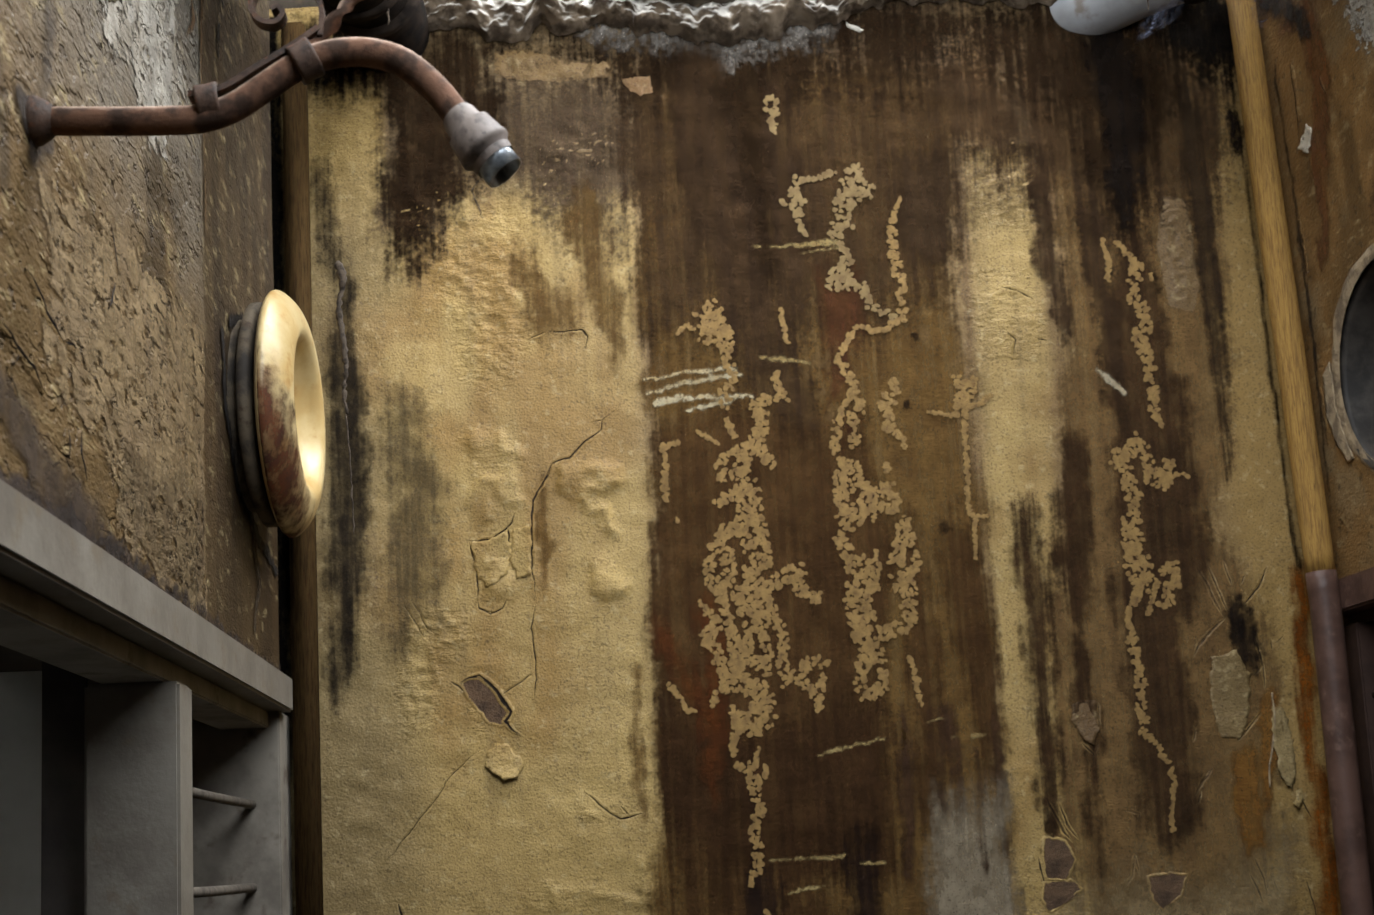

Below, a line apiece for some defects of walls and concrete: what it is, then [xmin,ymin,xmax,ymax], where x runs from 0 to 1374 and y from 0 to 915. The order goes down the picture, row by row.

peeling [102,0,196,106]
peeling [1332,0,1374,54]
peeling [148,135,171,159]
damp [367,199,394,239]
damp [426,195,465,241]
damp [494,25,1298,915]
crack [467,406,620,702]
spalling [450,671,524,781]
peeling [1209,649,1251,740]
peeling [1271,706,1303,808]
crack [583,790,645,823]
spalling [1039,835,1083,914]